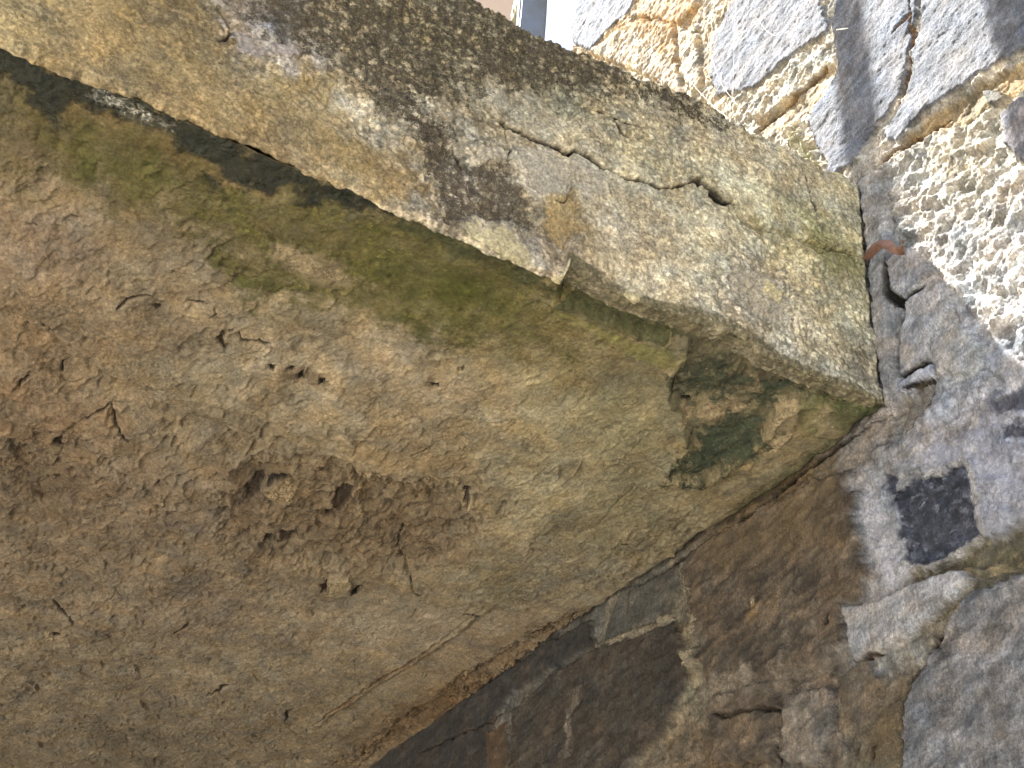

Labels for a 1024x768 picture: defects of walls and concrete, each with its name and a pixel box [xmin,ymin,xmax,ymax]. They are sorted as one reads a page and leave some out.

leakage [237,0,743,167]
crack [497,121,604,170]
crack [627,179,730,206]